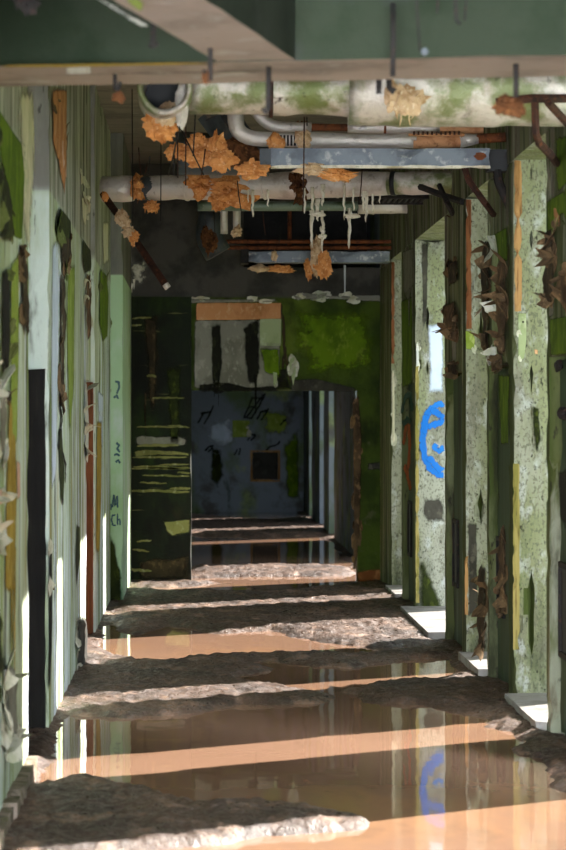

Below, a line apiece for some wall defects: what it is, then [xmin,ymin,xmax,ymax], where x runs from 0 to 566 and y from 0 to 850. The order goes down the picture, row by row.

rust [474,132,506,160]
spalling [0,162,30,336]
spalling [443,361,459,380]
spalling [432,235,508,375]
spalling [531,208,566,312]
spalling [0,360,18,555]
water stain [199,320,363,570]
spalling [469,525,508,661]